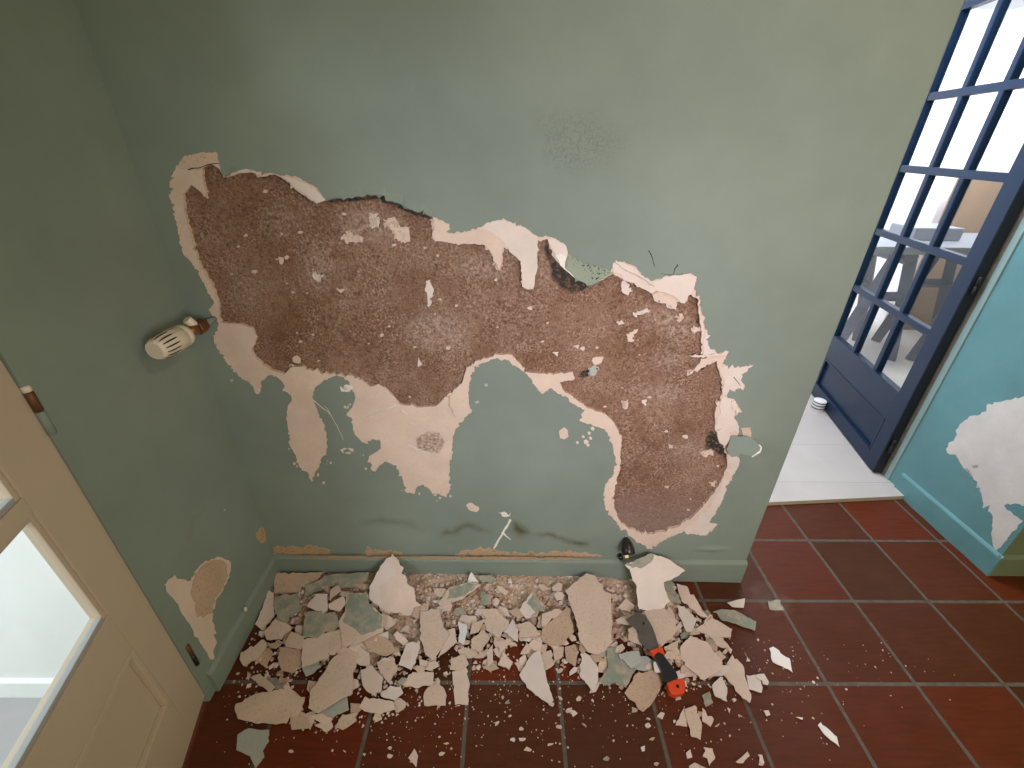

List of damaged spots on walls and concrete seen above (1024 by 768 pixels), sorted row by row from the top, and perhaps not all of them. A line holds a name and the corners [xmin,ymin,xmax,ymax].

spalling [164,152,762,712]
peeling [946,396,1024,550]